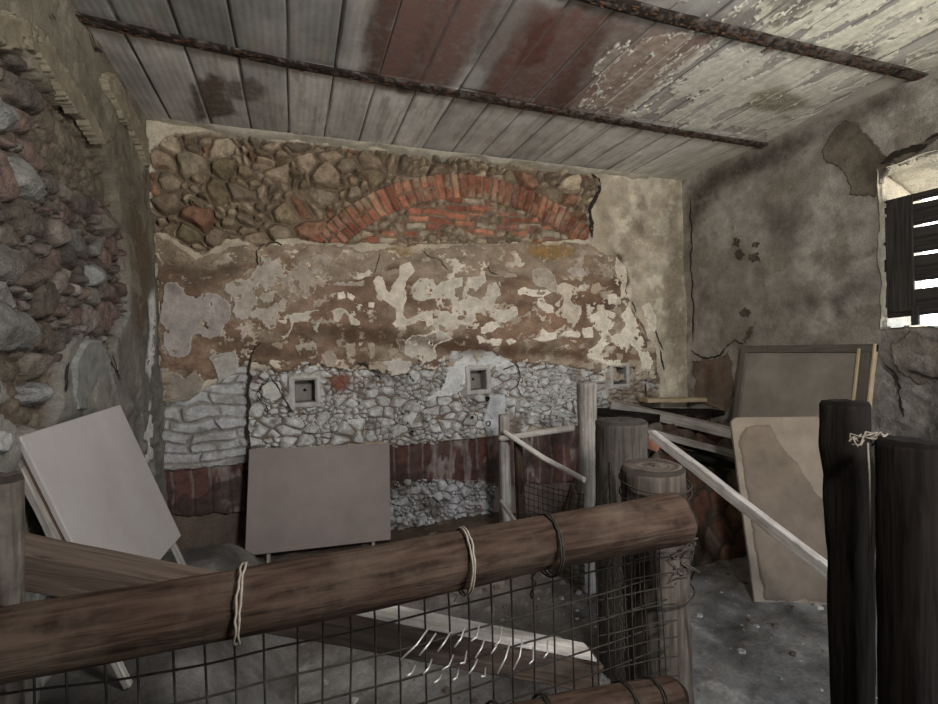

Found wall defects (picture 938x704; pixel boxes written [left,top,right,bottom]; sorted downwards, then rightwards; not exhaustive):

leakage [192,74,262,119]
peeling [578,30,904,142]
peeling [705,0,938,72]
peeling [822,120,938,198]
flaking render [0,10,128,454]
peeling [99,72,661,530]
crack [689,198,744,359]
crack [884,363,938,418]